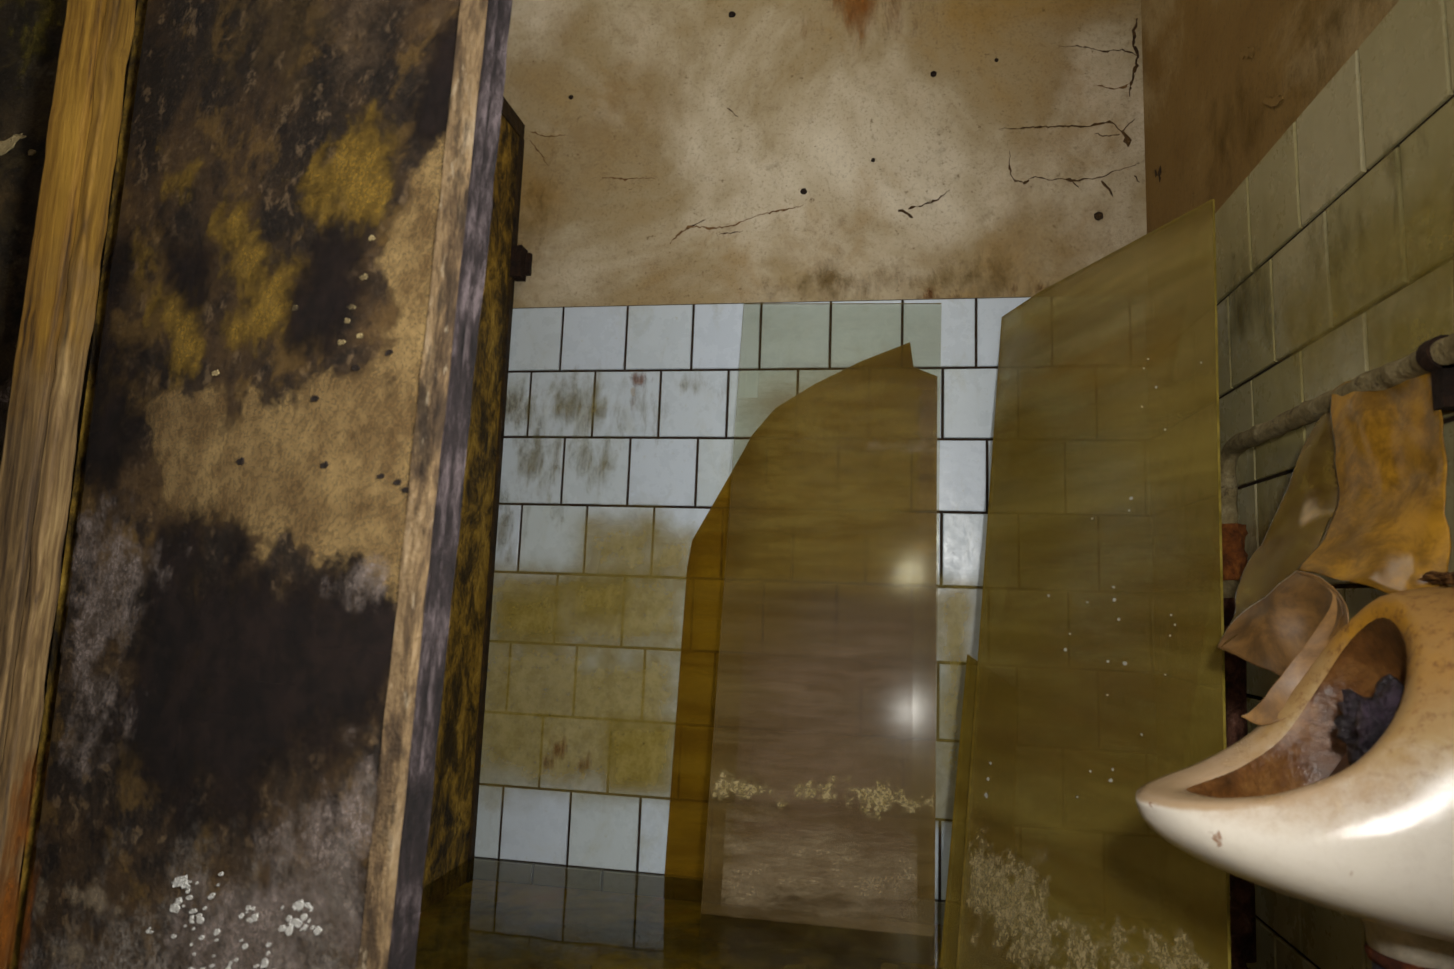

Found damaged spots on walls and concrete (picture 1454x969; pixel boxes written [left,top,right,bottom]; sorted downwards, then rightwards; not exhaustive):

crack [999,18,1142,196]
crack [670,205,803,244]
water stain [61,103,397,820]
water stain [52,764,377,969]